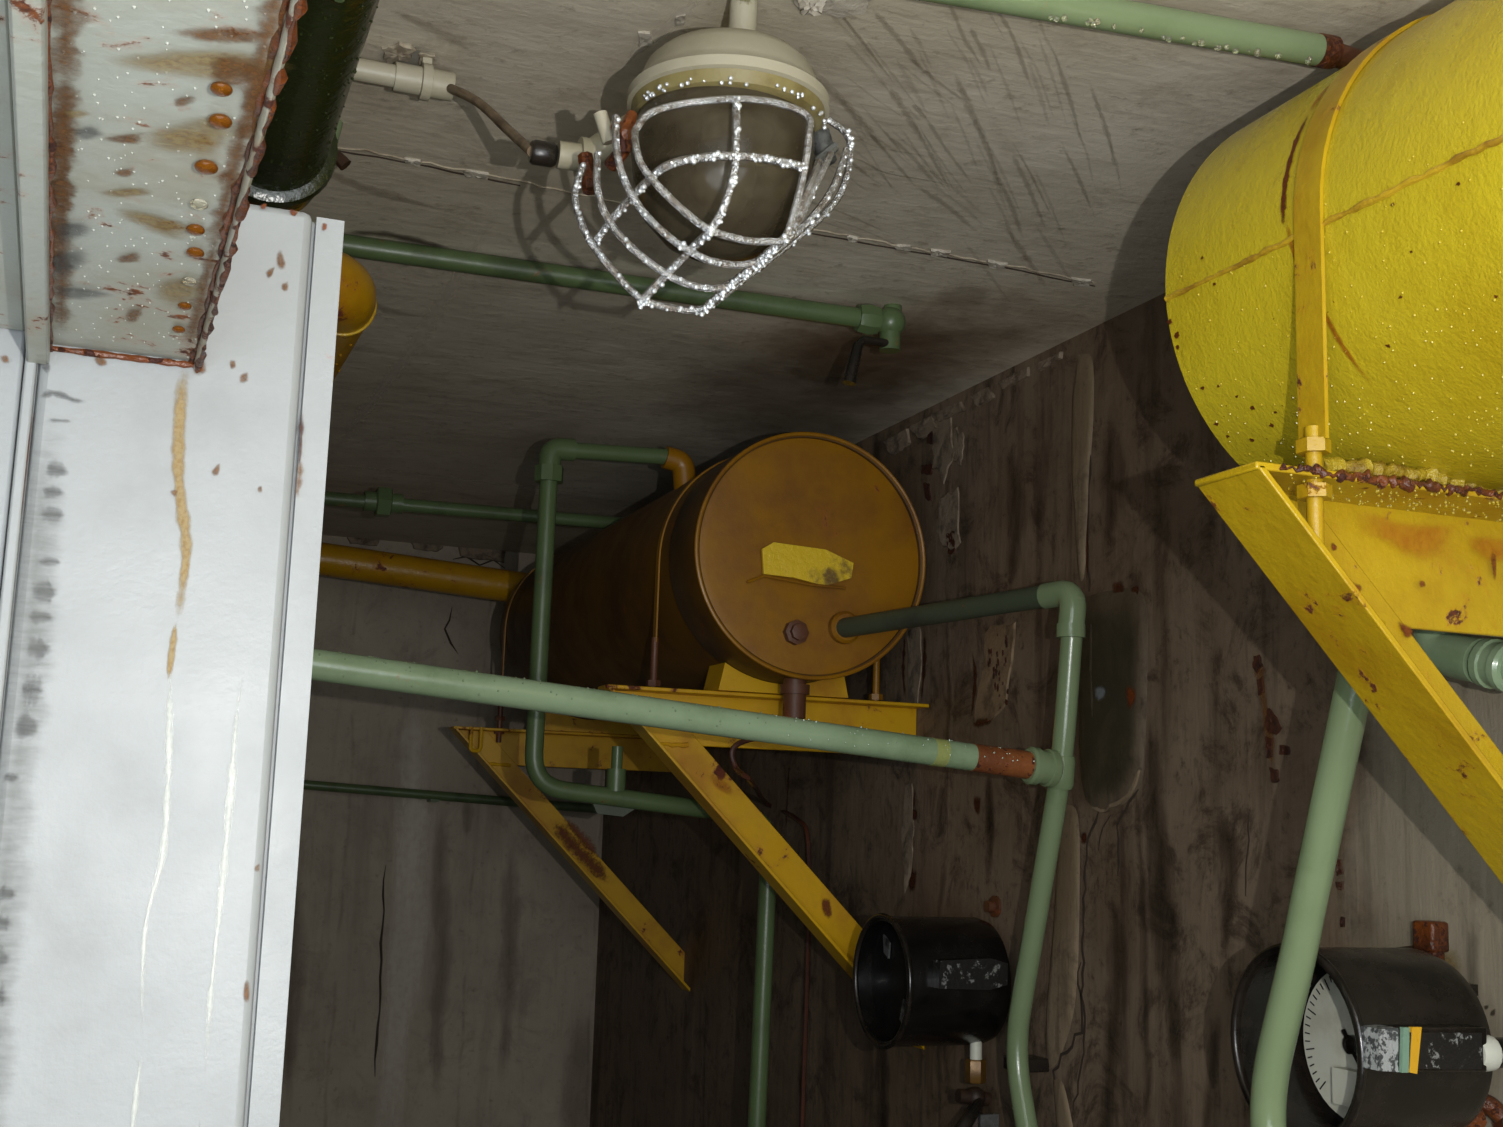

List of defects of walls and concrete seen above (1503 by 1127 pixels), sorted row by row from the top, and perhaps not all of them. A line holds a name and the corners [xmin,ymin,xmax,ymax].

corrosion [52,0,78,69]
corrosion [111,135,138,143]
corrosion [141,0,282,235]
corrosion [51,88,85,322]
corrosion [130,214,183,232]
corrosion [267,254,288,290]
corrosion [172,385,191,602]
flaking render [884,352,1063,555]
corrosion [167,628,177,674]
flaking render [902,627,926,703]
flaking render [972,622,1016,726]
crack [374,866,386,1072]